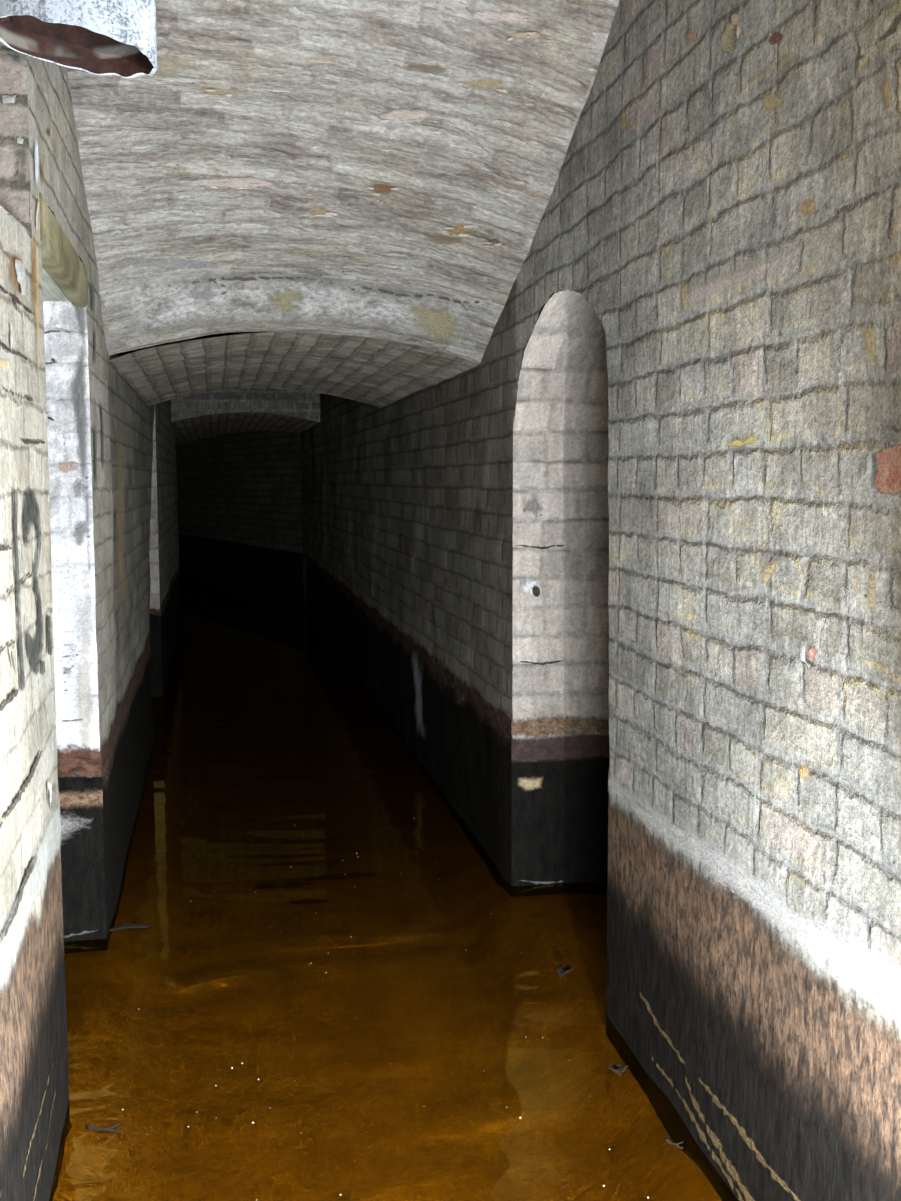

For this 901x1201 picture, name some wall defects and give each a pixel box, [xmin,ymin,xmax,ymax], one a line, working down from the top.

leakage [523,500,542,516]
crack [517,543,563,551]
leakage [0,535,901,1201]